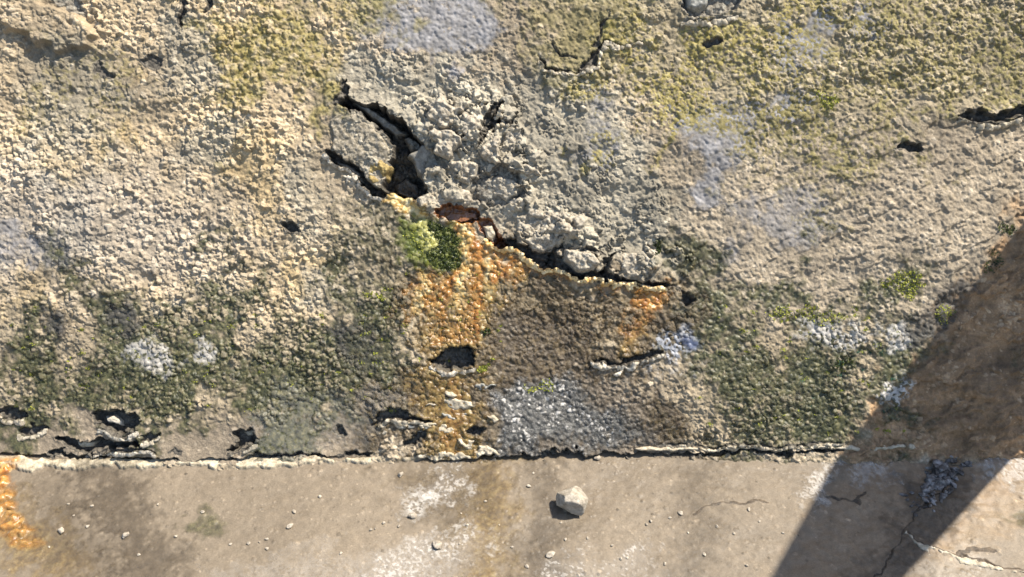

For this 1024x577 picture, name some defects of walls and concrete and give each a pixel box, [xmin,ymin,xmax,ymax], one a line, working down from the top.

crack [537,11,643,77]
rust [384,193,427,220]
spalling [321,78,542,249]
spalling [956,104,1024,132]
spalling [55,408,159,459]
leakage [13,341,335,439]
crack [0,383,916,466]
rust [407,221,528,459]
leakage [455,269,711,464]
leakage [725,321,864,438]
rust [0,457,38,548]
crack [905,530,1024,573]